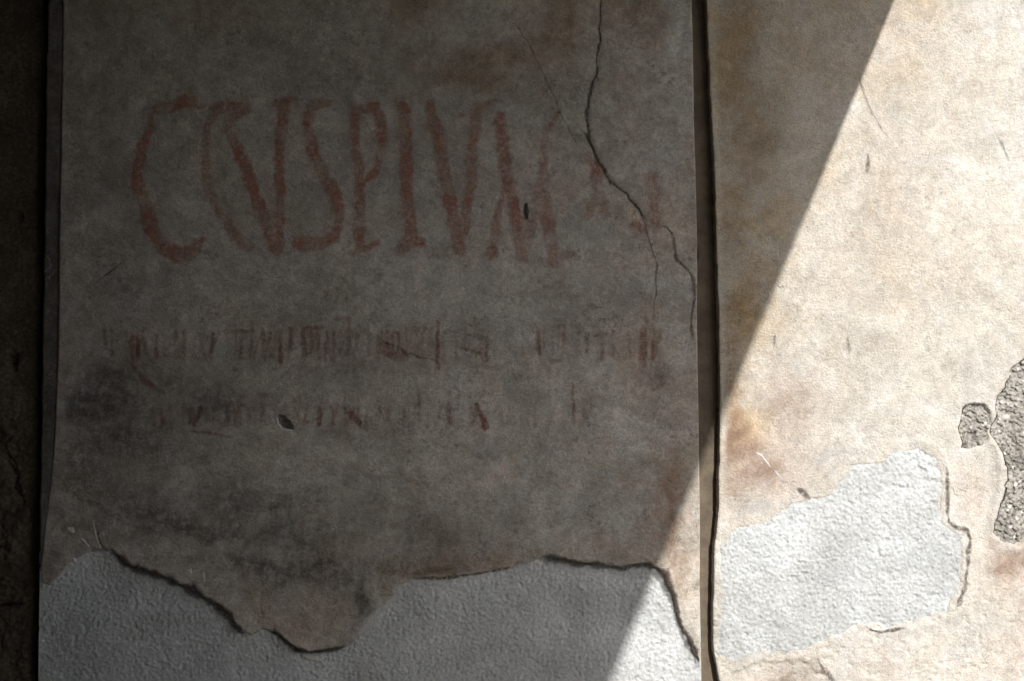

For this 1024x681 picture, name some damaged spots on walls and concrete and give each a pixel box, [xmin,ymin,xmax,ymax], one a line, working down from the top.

crack [584,1,699,335]
spalling [38,521,701,681]
spalling [712,449,963,663]
spalling [958,360,1024,544]